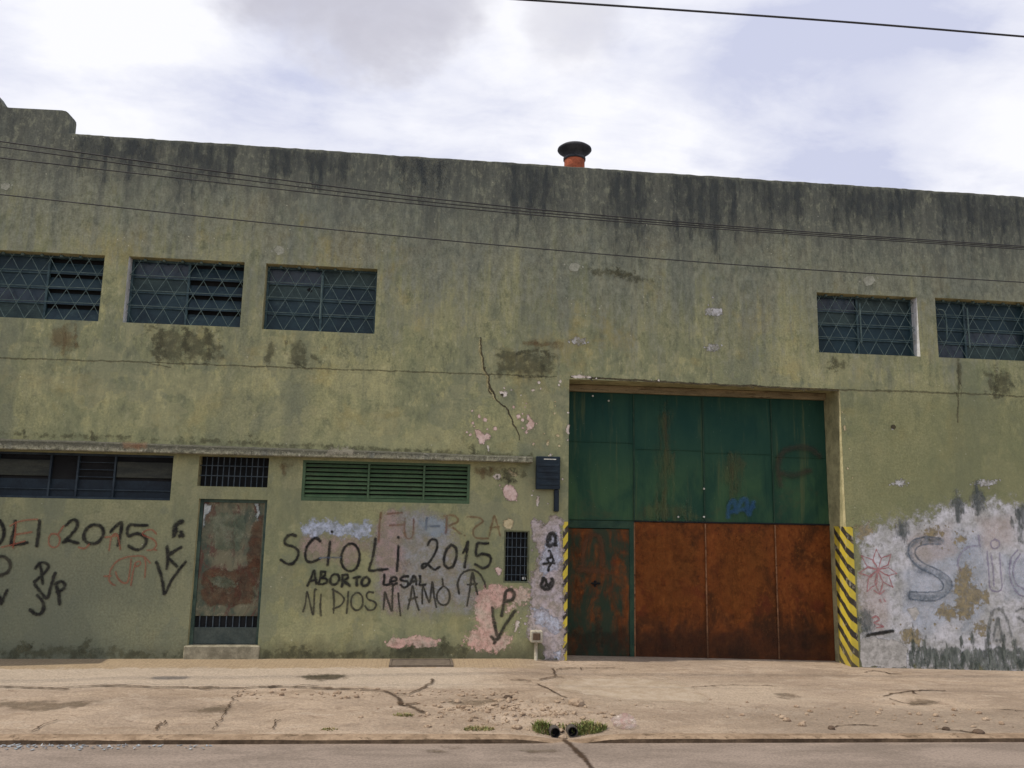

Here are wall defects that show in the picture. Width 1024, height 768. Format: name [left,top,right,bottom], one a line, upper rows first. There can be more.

damp [151,326,224,361]
crack [0,337,557,440]
flaking render [466,410,497,451]
damp [497,349,555,378]
flaking render [499,381,570,456]
peeling [301,490,567,661]
peeling [855,479,1024,671]